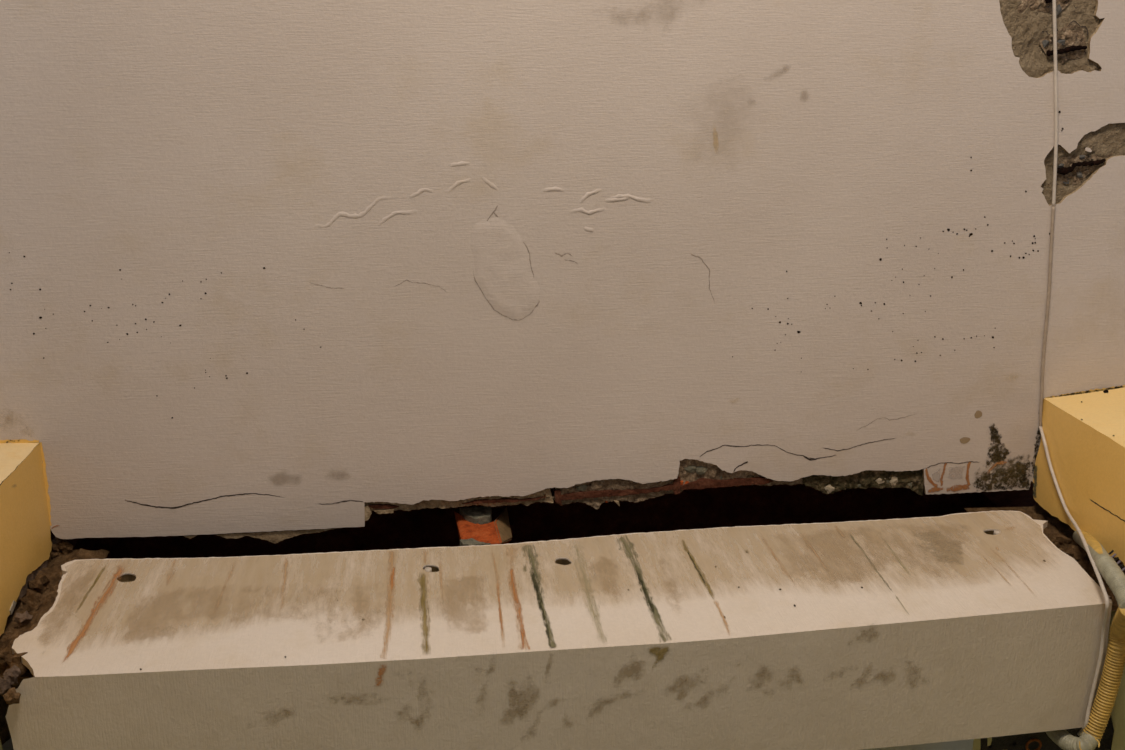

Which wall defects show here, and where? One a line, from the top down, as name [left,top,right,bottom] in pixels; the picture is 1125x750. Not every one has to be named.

spalling [999,0,1102,78]
spalling [1041,123,1125,205]
crack [128,493,280,509]
spalling [216,528,336,544]
spalling [365,459,924,521]
crack [700,438,894,471]
corrosion [925,462,971,493]
leakage [974,411,1041,497]
corrosion [377,552,395,686]
corrosion [494,560,530,649]
leakage [69,511,1031,663]